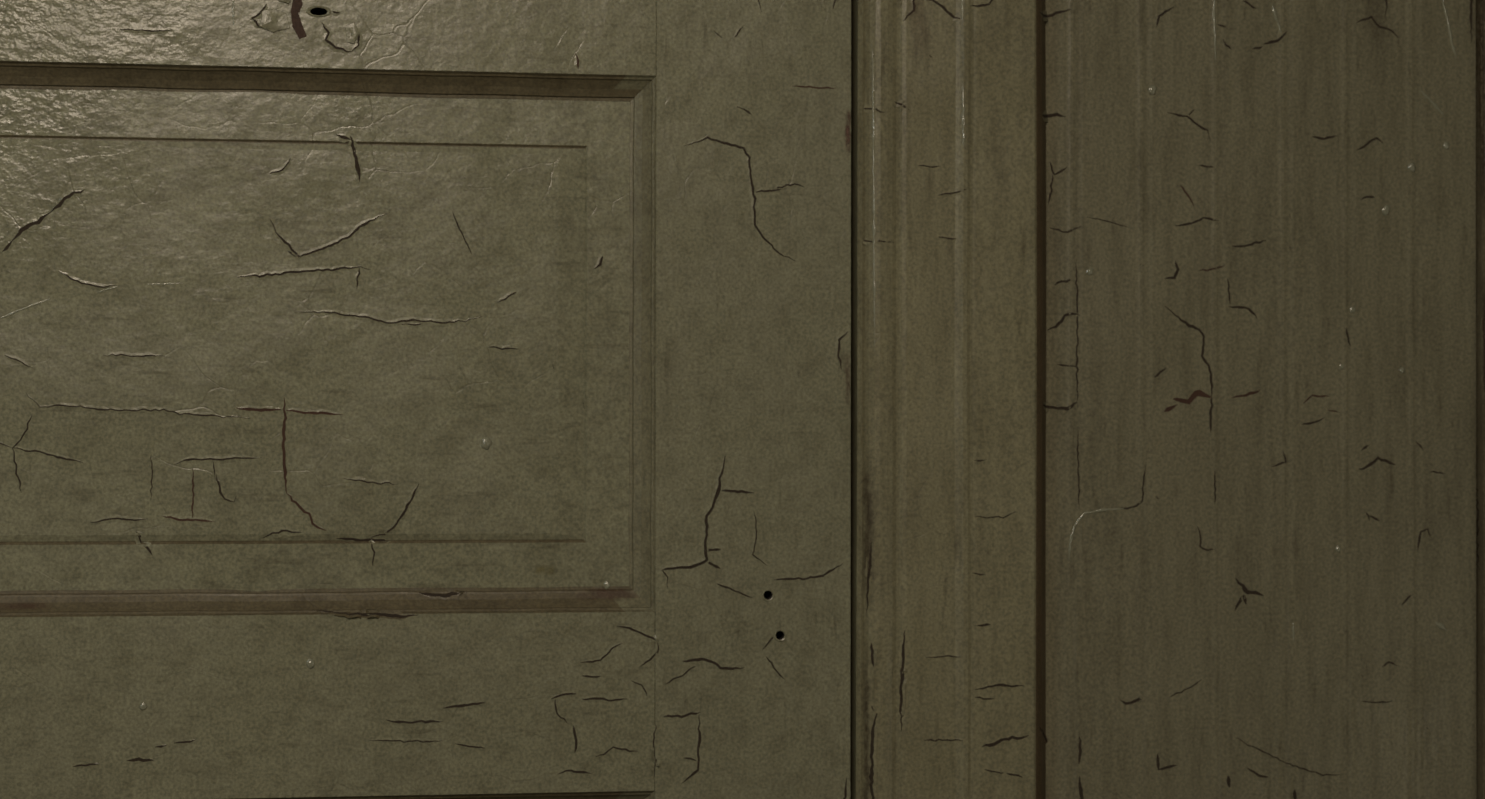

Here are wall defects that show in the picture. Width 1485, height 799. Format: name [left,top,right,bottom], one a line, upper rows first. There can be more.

crack [903,0,996,21]
crack [2,189,85,252]
crack [59,271,117,291]
crack [336,133,363,182]
crack [237,212,519,352]
crack [684,106,804,262]
crack [1043,161,1159,512]
crack [1140,109,1267,433]
crack [0,354,419,566]
crack [314,588,464,619]
crack [551,624,784,784]
crack [661,456,1086,799]